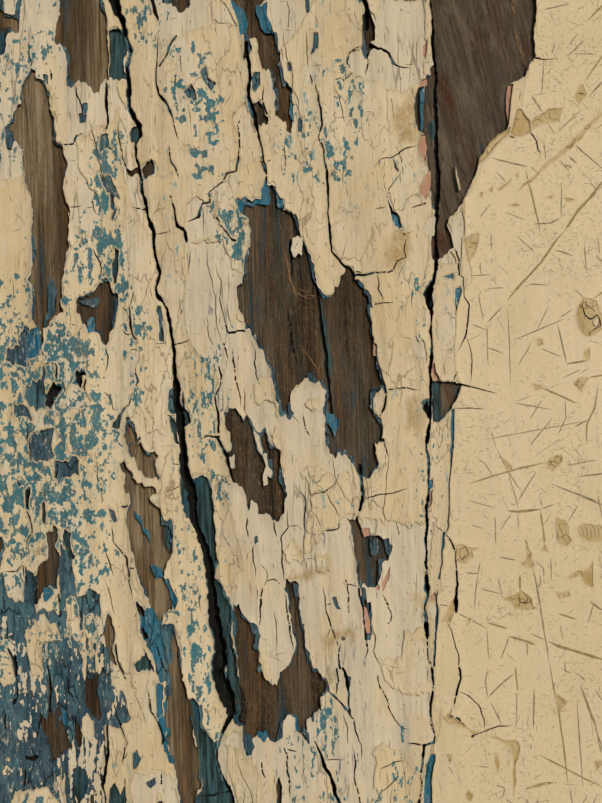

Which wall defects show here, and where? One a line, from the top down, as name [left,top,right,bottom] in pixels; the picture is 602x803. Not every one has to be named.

peeling [575,85,587,104]
peeling [347,0,563,279]
peeling [480,113,602,198]
peeling [0,0,156,484]
crack [46,329,61,387]
crack [57,0,424,803]
peeling [577,298,602,337]
peeling [0,180,479,803]
crack [4,649,76,736]